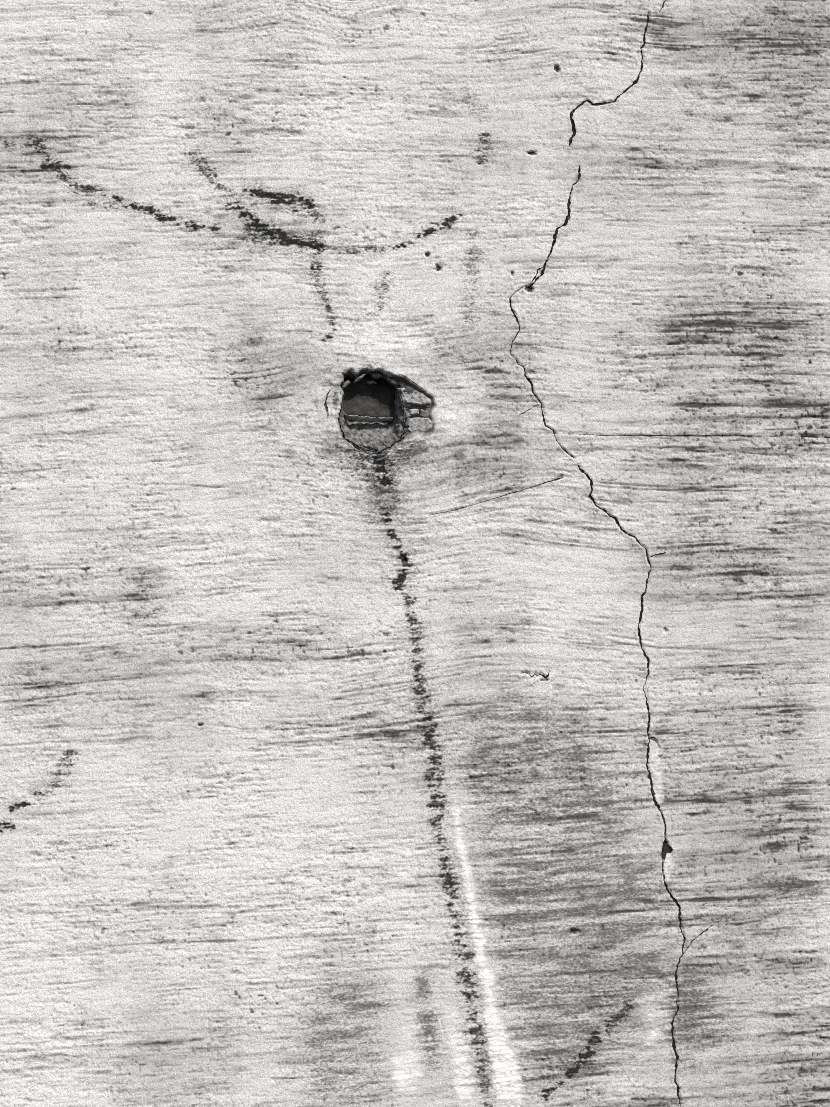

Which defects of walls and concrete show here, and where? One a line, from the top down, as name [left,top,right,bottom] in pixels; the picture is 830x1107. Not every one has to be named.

crack [510,0,711,1105]